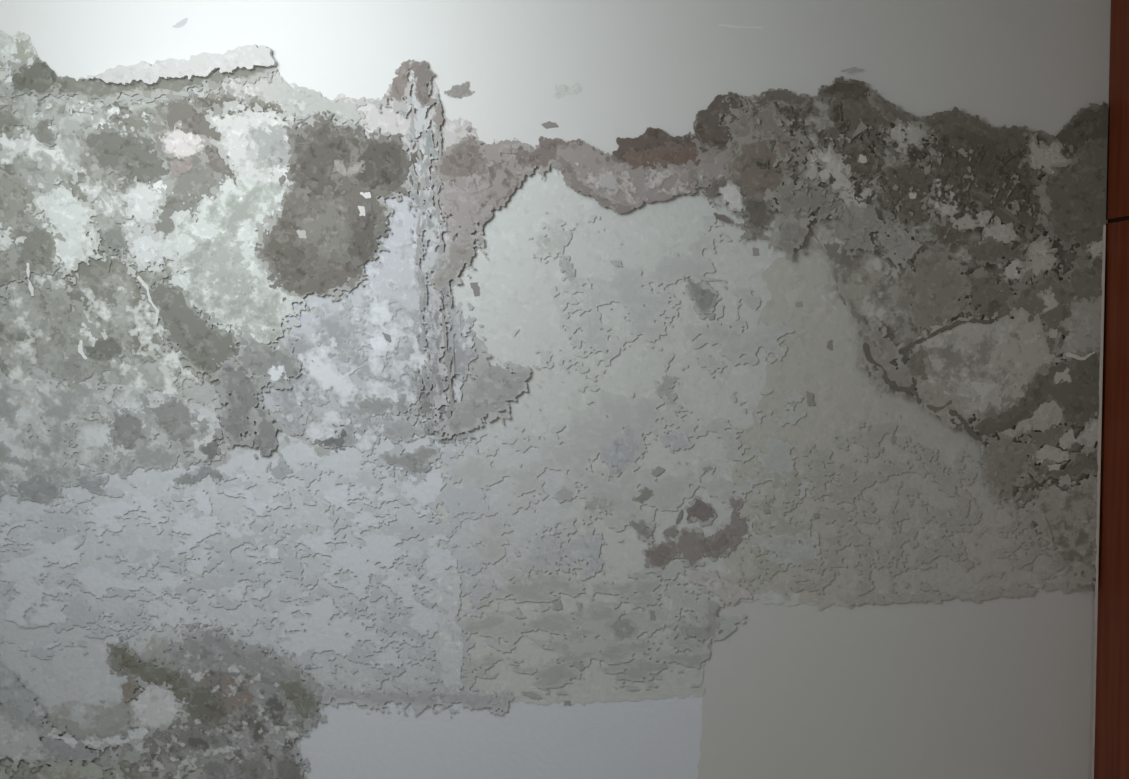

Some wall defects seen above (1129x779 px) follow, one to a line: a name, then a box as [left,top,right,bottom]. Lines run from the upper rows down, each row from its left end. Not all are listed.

peeling [718,177,746,218]
flaking render [0,30,587,779]
water stain [0,38,1108,606]
flaking render [681,273,727,319]
peeling [738,90,1103,592]
crack [833,268,1031,441]
crack [1066,352,1095,360]
water stain [505,466,752,652]
water stain [0,622,542,779]